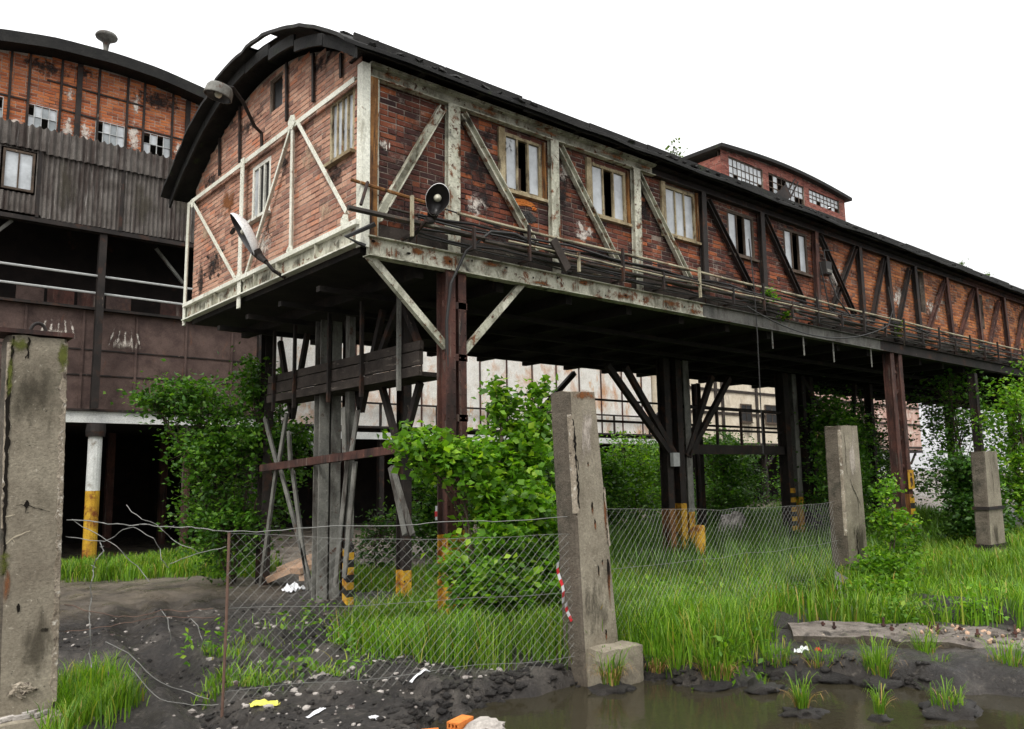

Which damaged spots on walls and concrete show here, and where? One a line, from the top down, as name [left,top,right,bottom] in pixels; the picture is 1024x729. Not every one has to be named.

crack [572,419,609,546]